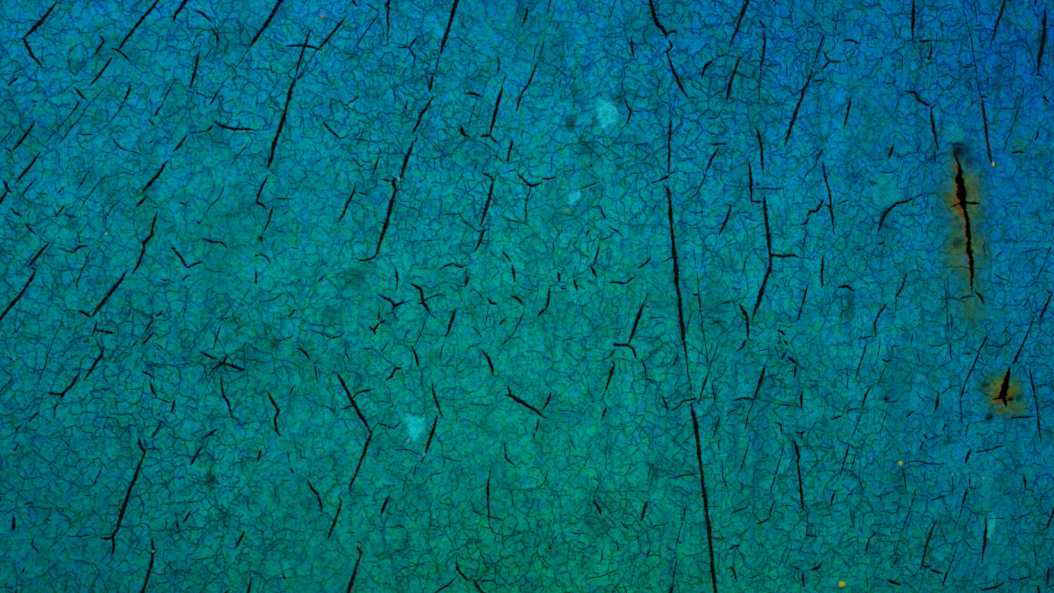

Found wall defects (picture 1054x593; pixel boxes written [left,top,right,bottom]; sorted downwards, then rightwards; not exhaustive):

rust [945,164,983,283]
crack [257,0,1054,593]
crack [0,308,185,593]
rust [986,375,1023,414]
crack [166,500,245,548]